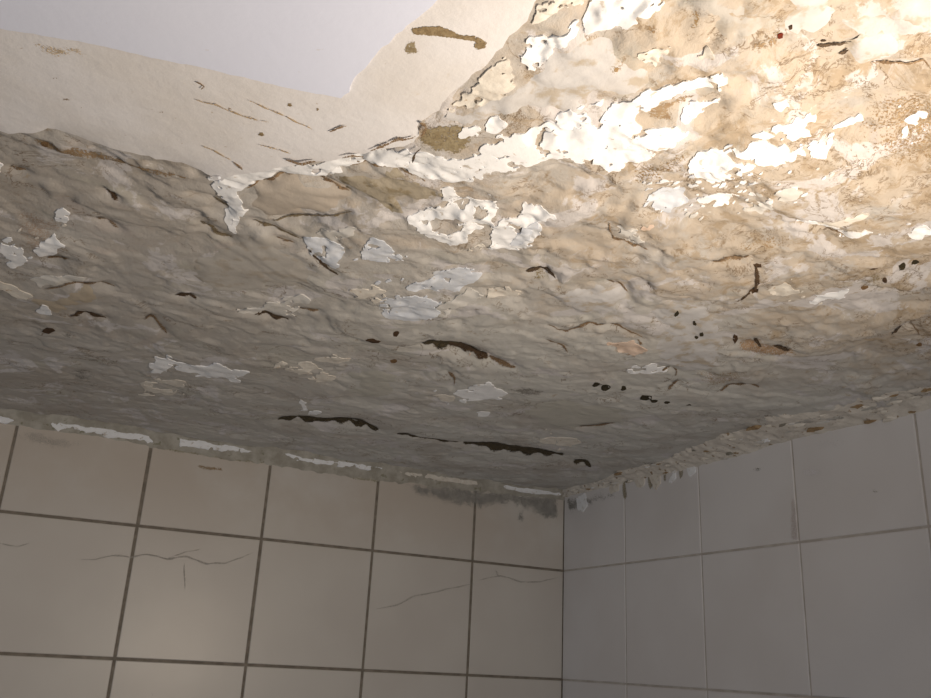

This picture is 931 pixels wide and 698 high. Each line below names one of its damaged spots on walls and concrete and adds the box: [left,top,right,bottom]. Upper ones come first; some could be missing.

peeling [0,0,727,252]
peeling [902,106,928,151]
peeling [642,112,863,221]
peeling [0,208,70,269]
peeling [303,226,407,275]
peeling [796,212,885,239]
peeling [906,223,931,240]
peeling [349,267,522,321]
peeling [767,279,849,305]
peeling [138,355,250,396]
spalling [504,387,931,512]
crack [84,549,247,581]